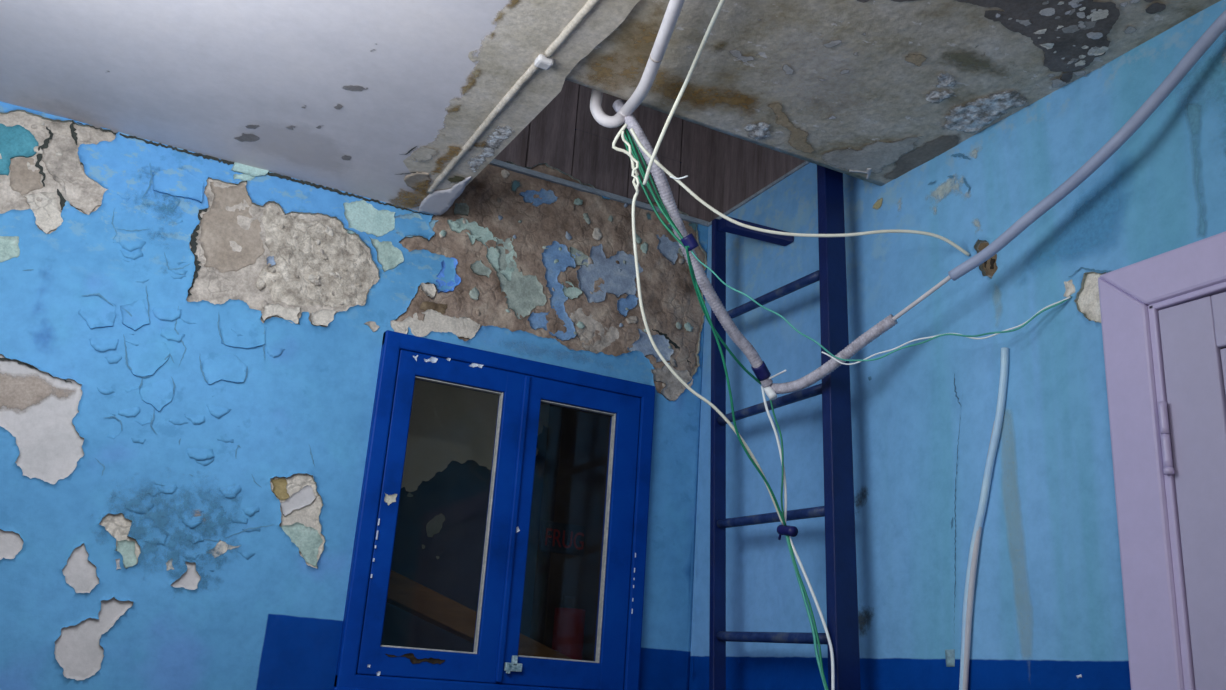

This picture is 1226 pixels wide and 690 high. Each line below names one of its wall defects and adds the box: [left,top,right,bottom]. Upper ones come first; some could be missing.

spalling [0,111,130,234]
spalling [152,178,379,342]
spalling [364,0,706,401]
spalling [0,355,84,484]
spalling [0,529,24,560]
spalling [99,484,177,570]
water stain [112,489,232,589]
spalling [270,474,325,568]
spalling [54,544,133,681]